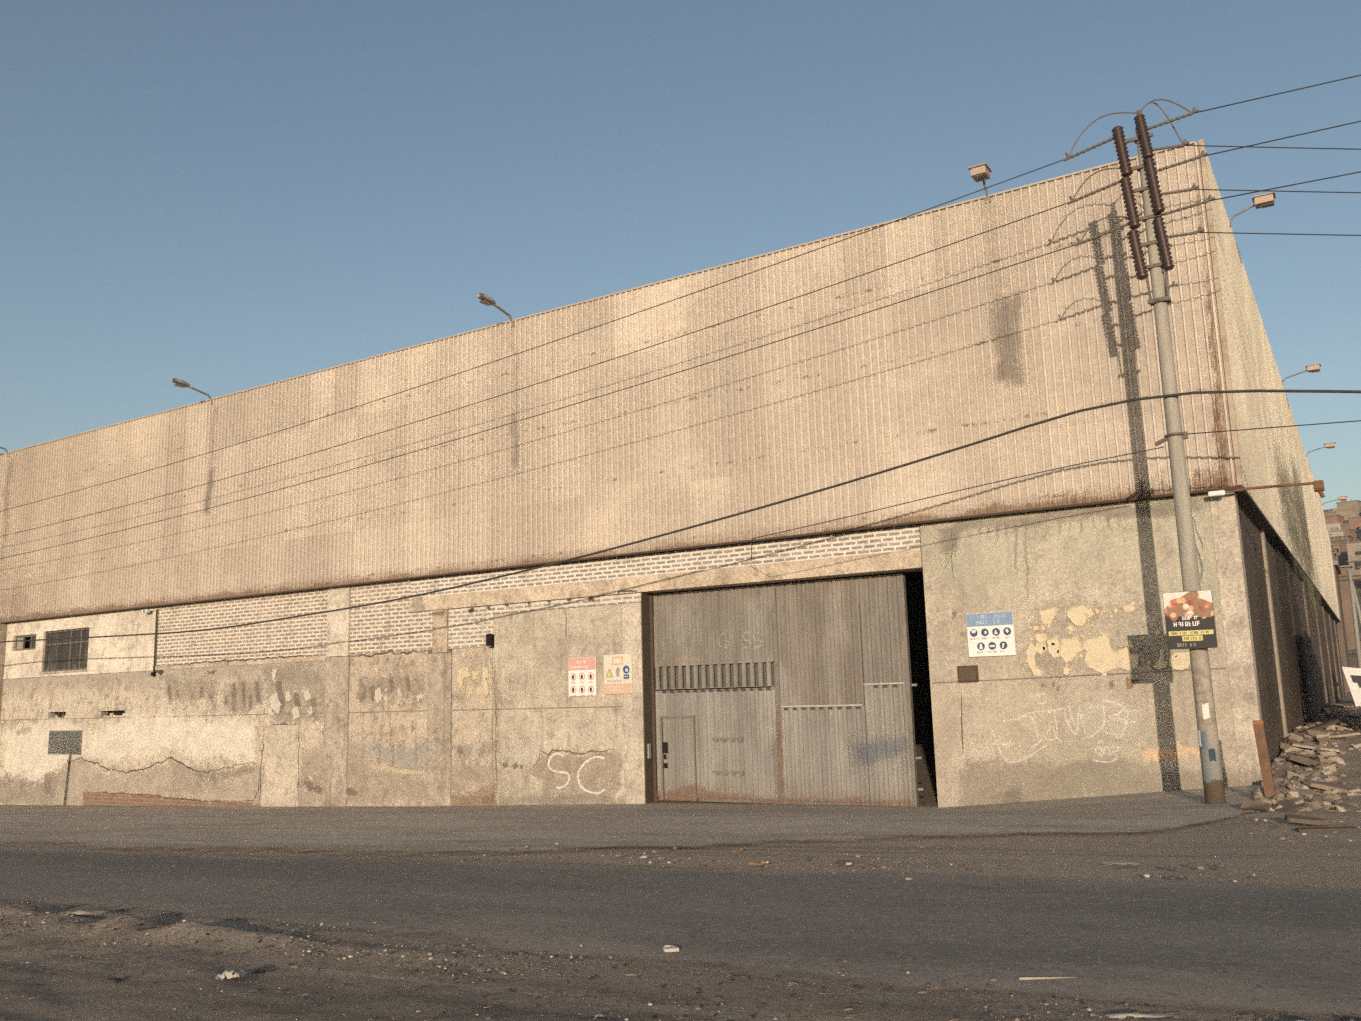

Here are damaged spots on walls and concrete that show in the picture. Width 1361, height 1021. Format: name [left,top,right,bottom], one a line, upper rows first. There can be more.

water stain [993,298,1022,383]
corrosion [1189,253,1231,491]
corrosion [815,473,1173,533]
water stain [939,499,1175,554]
peeling [1023,601,1190,677]
peeling [0,653,325,807]
flaking render [299,739,426,806]